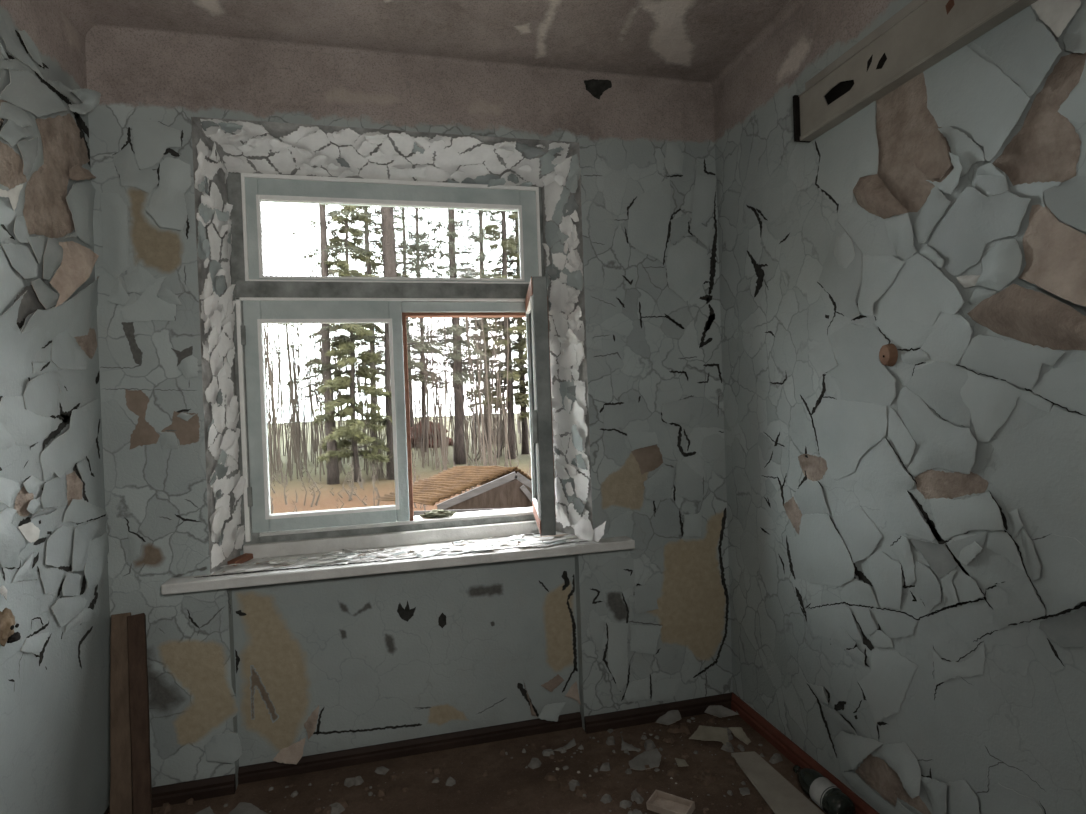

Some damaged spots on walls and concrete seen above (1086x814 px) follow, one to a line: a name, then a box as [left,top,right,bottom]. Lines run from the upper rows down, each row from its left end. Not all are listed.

peeling [191,0,227,18]
spalling [584,79,612,99]
crack [747,205,790,297]
peeling [0,14,606,653]
crack [591,159,729,696]
crack [817,282,926,376]
peeling [783,0,1086,724]
crack [187,547,519,636]
crack [539,569,661,701]
crack [761,372,1086,757]
crack [313,707,431,735]
peeling [807,682,1043,814]